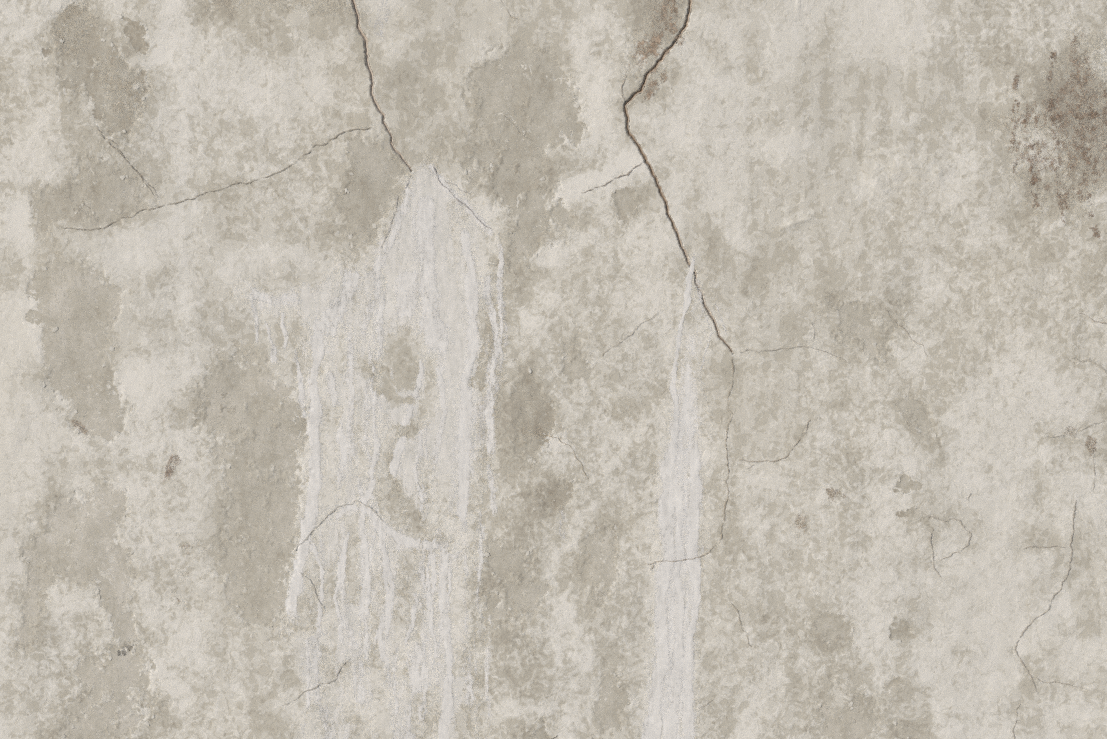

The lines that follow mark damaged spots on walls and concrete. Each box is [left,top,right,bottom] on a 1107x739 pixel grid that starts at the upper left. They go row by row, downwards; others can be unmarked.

crack [61,0,490,249]
leakage [249,163,508,739]
leakage [641,256,727,739]
crack [583,0,844,570]
crack [1012,422,1100,739]
rust [1008,32,1107,239]